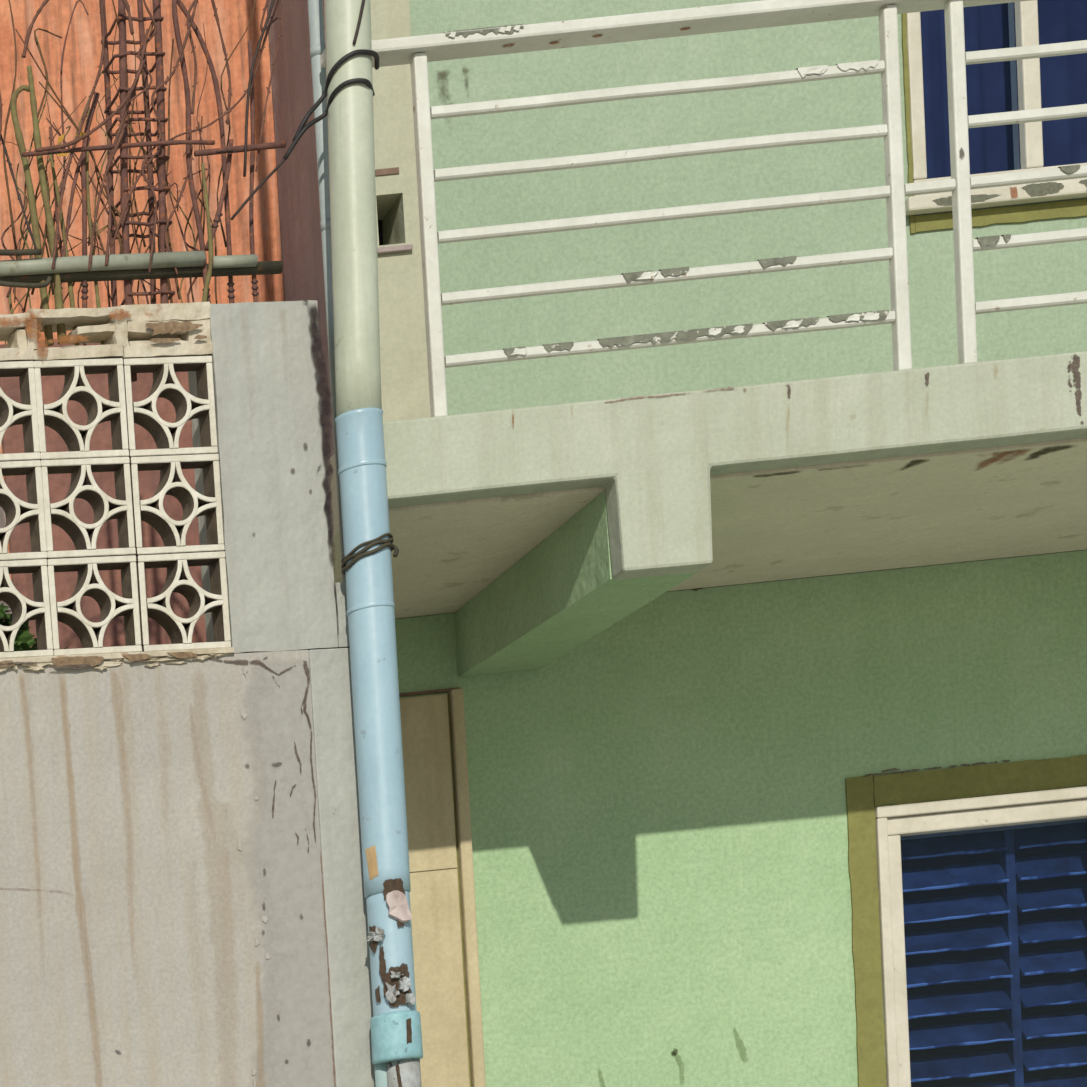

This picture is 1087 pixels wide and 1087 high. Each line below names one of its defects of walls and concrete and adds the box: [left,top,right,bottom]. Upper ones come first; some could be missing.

peeling [444,24,524,38]
peeling [971,165,1087,202]
peeling [932,196,952,206]
peeling [757,256,797,268]
peeling [621,267,689,283]
rust [109,309,131,320]
rust [0,311,88,358]
peeling [596,310,889,347]
peeling [502,346,527,357]
peeling [542,342,574,352]
spalling [0,652,230,673]
crack [207,656,336,1087]